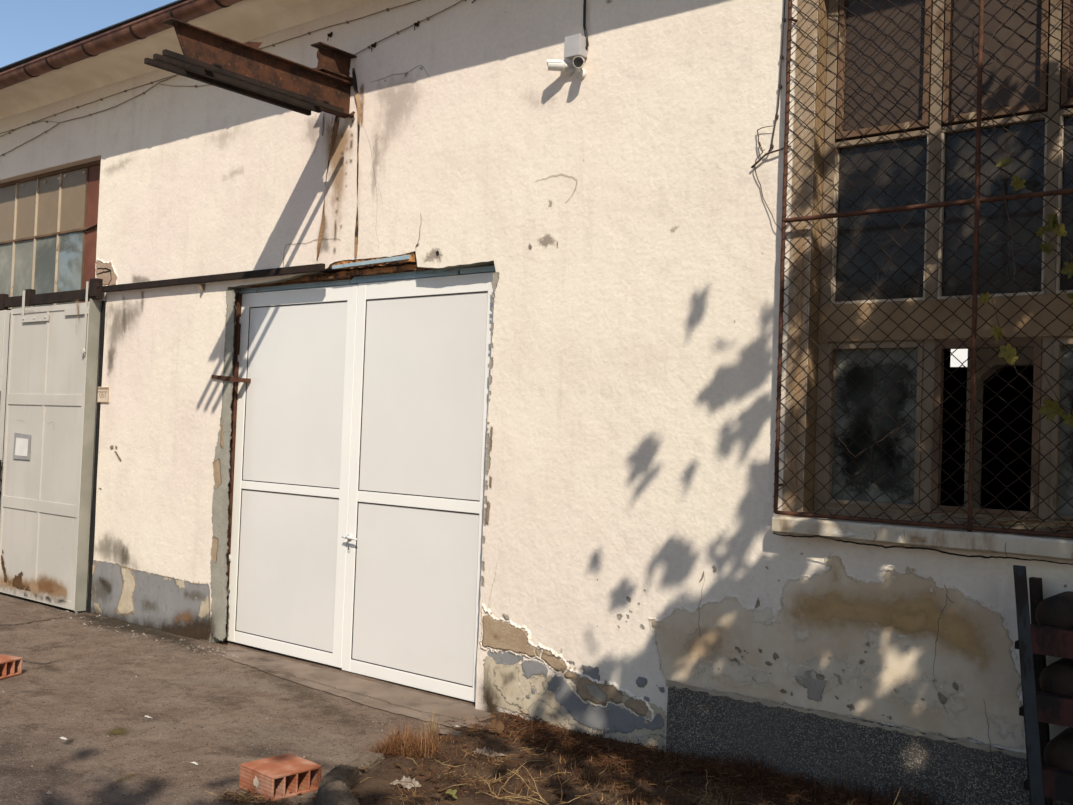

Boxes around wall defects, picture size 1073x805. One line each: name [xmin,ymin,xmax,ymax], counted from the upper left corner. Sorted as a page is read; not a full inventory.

flaking render [492,272,500,310]
peeling [84,289,236,641]
flaking render [482,422,493,543]
rust [0,550,66,597]
peeling [479,552,1026,752]